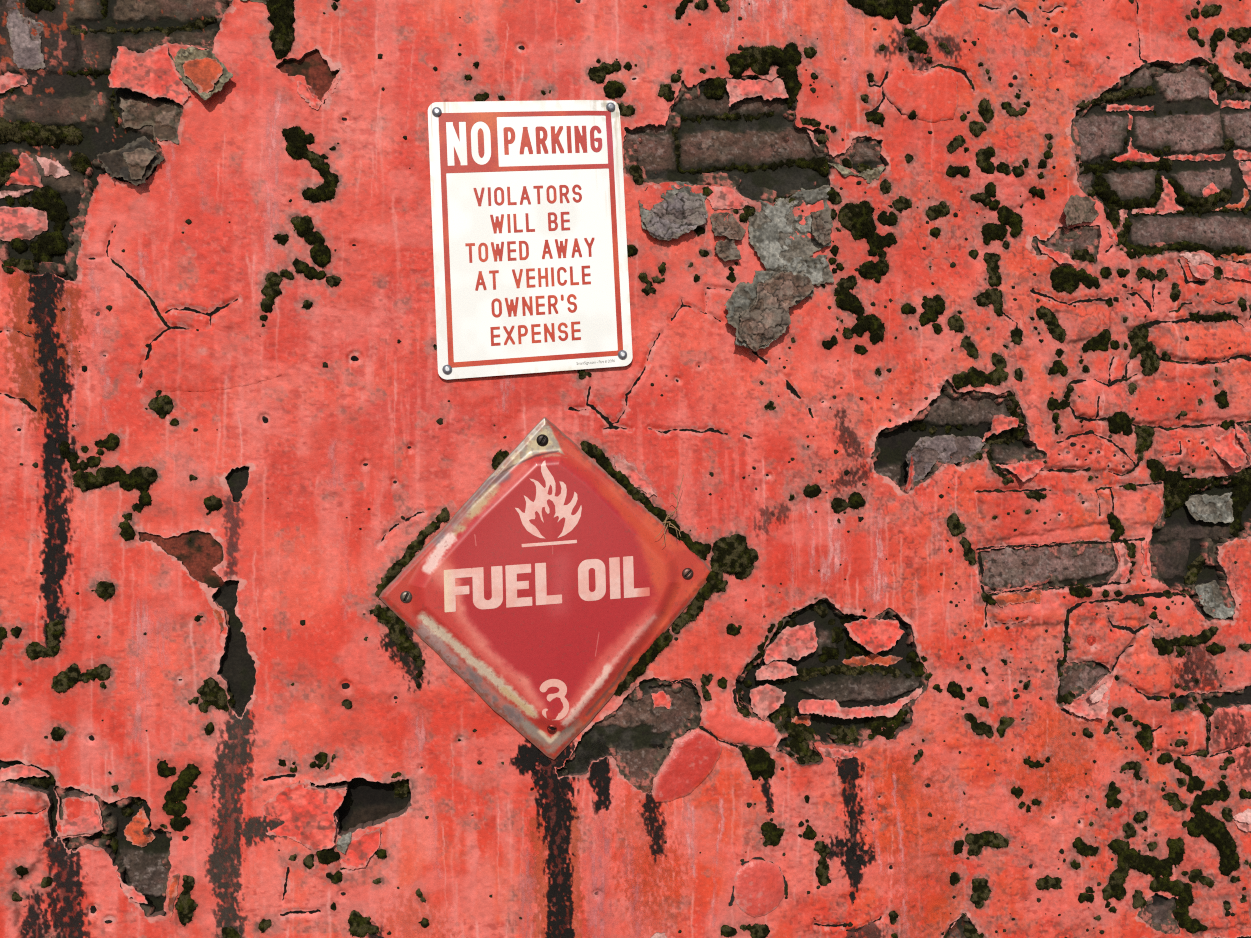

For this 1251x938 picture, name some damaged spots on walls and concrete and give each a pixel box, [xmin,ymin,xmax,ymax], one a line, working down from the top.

water stain [27,272,77,647]
spalling [0,0,269,281]
crack [89,224,238,382]
crack [568,287,752,439]
spalling [623,75,886,352]
crack [752,351,814,418]
crack [976,259,1251,733]
spalling [1031,60,1251,282]
spalling [735,597,928,765]
water stain [205,708,287,938]
water stain [510,738,612,938]
water stain [826,750,882,904]